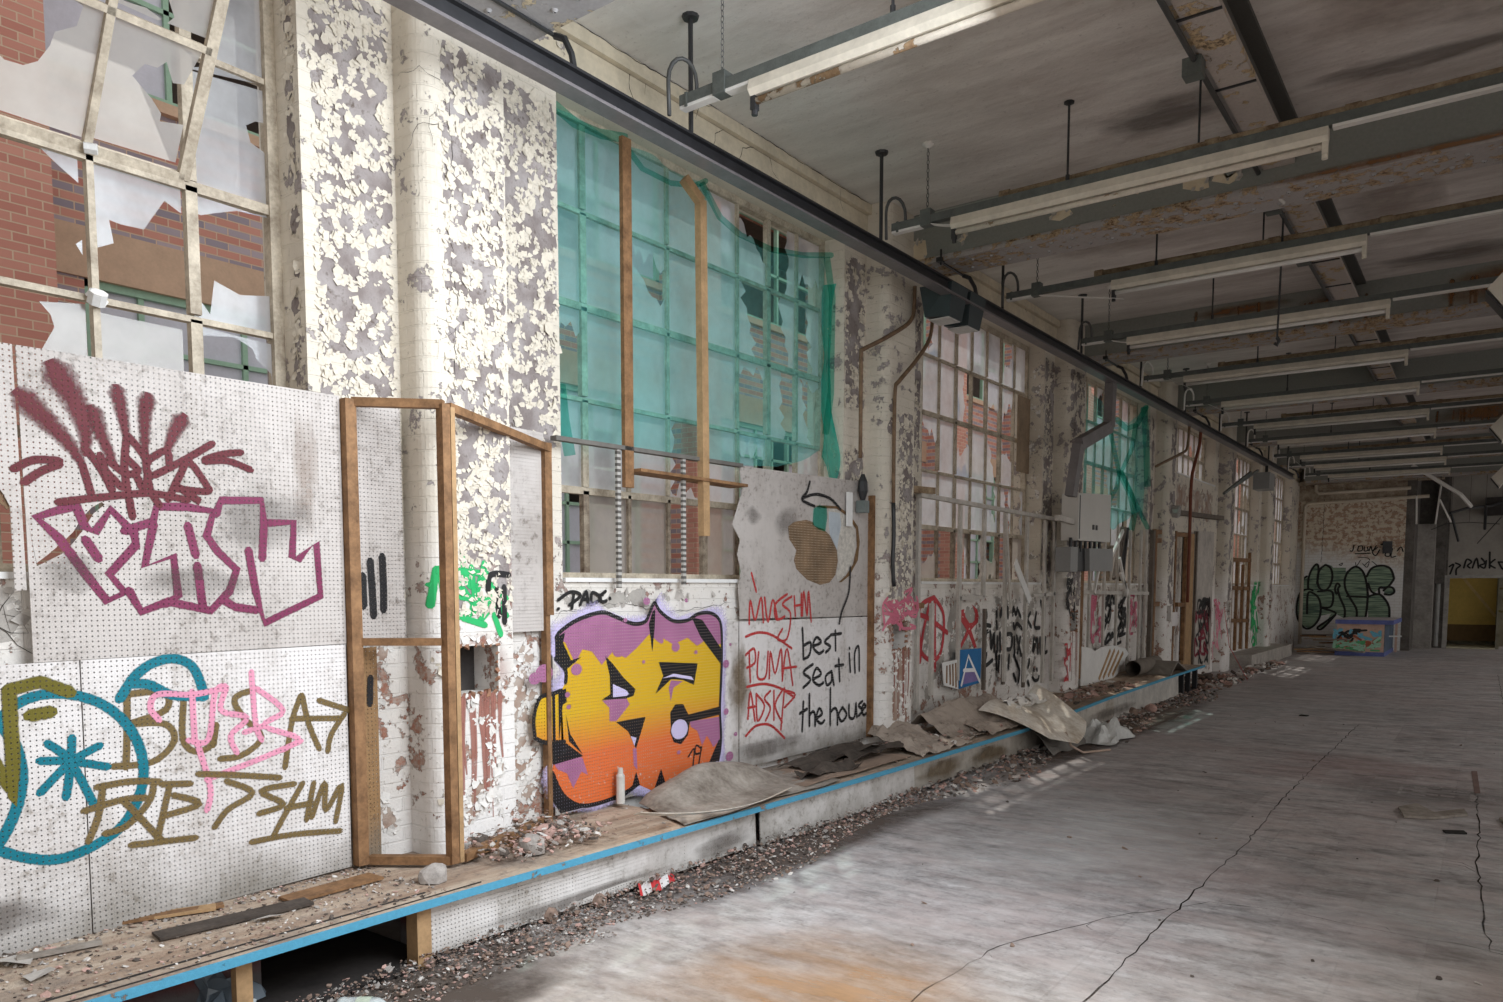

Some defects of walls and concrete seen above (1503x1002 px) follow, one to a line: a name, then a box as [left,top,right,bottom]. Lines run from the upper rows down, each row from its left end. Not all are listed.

peeling [280,0,407,620]
peeling [844,254,867,411]
peeling [429,39,562,831]
peeling [844,445,866,481]
peeling [886,301,1086,721]
peeling [0,587,31,643]
crack [1304,793,1503,955]